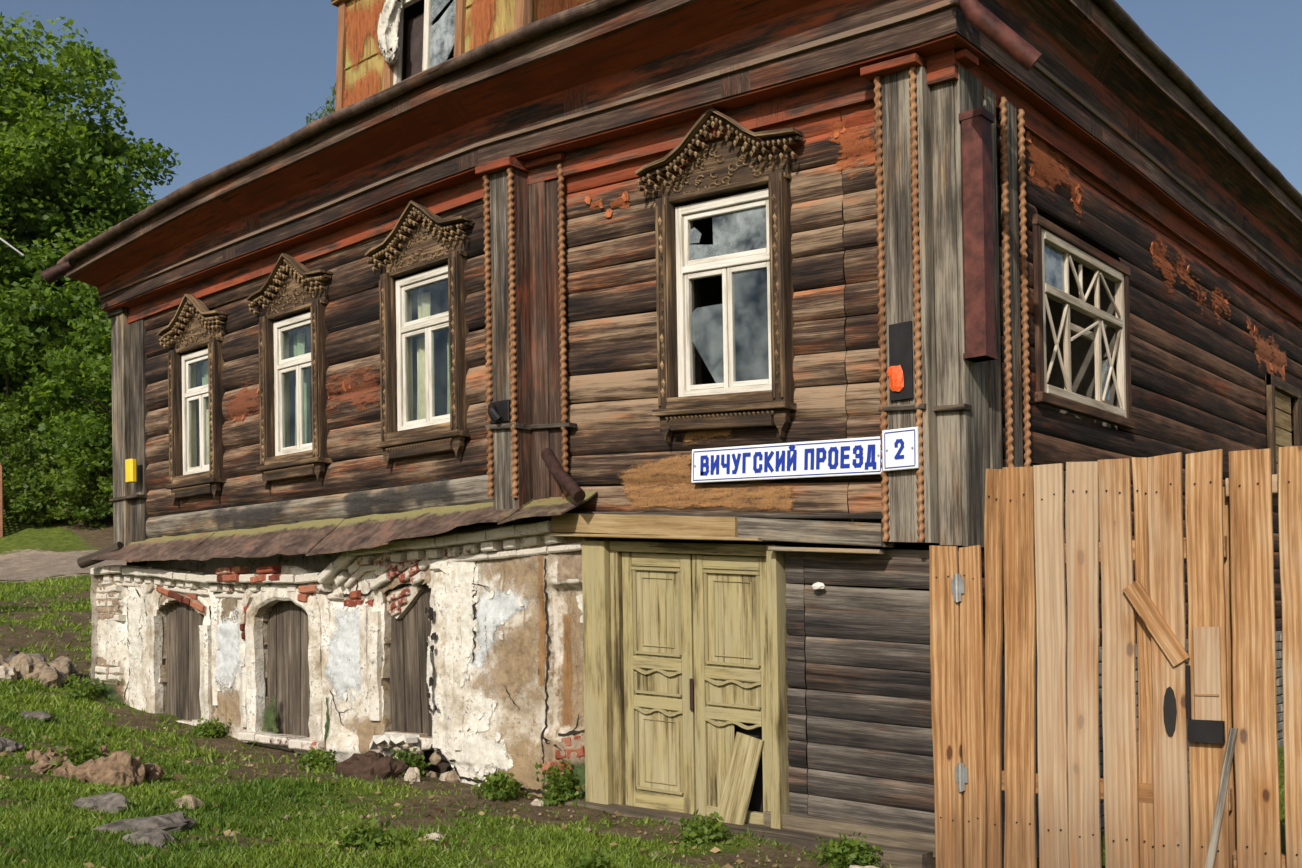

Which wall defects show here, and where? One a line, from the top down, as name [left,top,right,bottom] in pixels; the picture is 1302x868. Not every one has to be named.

peeling [1024,131,1084,217]
peeling [1150,235,1231,324]
peeling [1246,317,1288,381]
peeling [95,565,282,693]
flaking render [297,584,318,603]
peeling [324,552,527,713]
flaking render [557,537,585,623]
peeling [446,695,513,779]
spalling [542,736,585,796]